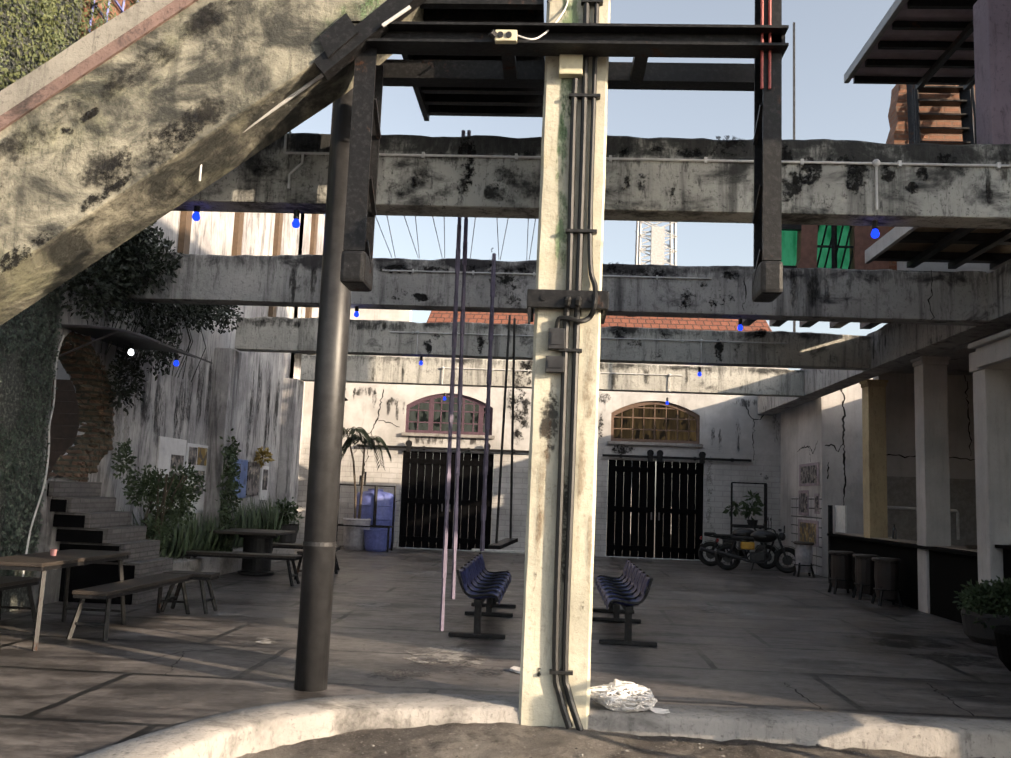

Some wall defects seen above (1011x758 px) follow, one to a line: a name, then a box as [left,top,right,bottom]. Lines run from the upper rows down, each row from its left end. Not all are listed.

leakage [183,1,232,35]
leakage [101,42,176,101]
leakage [0,101,99,162]
leakage [80,99,224,212]
leakage [439,136,476,194]
leakage [782,144,870,202]
leakage [905,167,928,194]
leakage [0,229,52,275]
leakage [246,364,280,457]
crack [364,389,398,472]
crack [799,389,846,506]
crack [949,375,975,461]